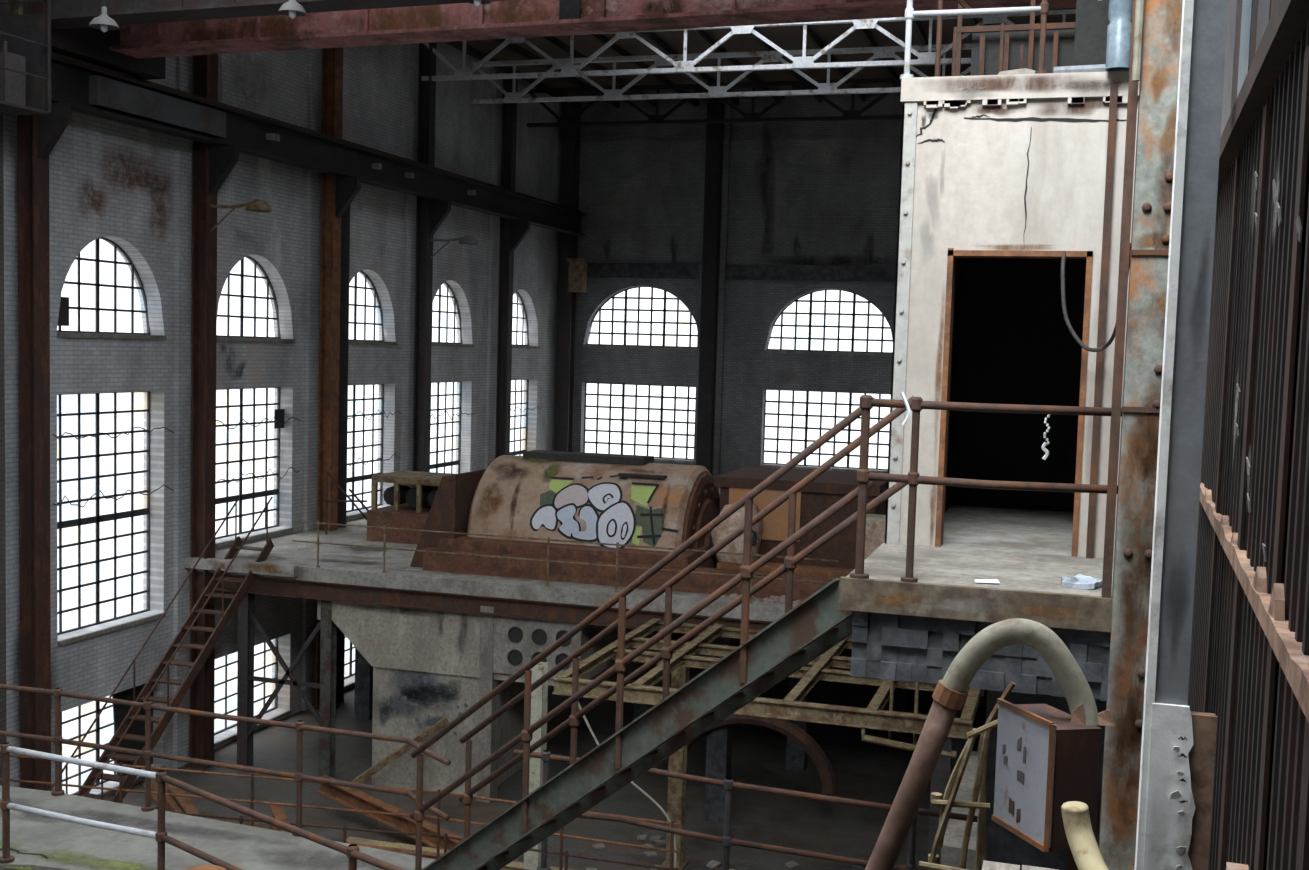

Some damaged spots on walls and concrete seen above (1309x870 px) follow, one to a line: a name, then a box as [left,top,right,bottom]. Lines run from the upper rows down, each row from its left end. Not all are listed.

crack [916,108,1127,249]
rust [1143,115,1176,249]
rust [1109,402,1159,844]
water stain [69,812,243,838]